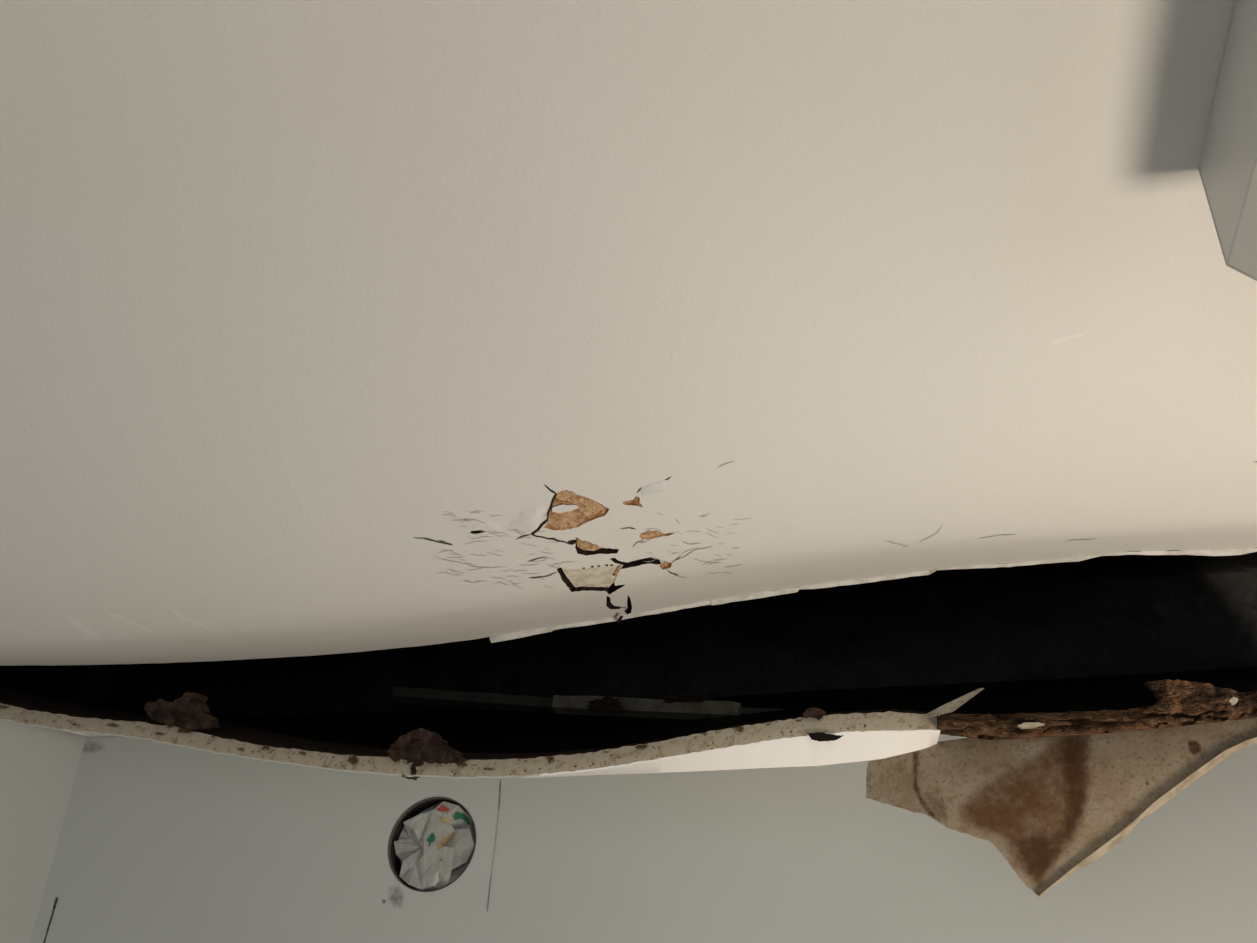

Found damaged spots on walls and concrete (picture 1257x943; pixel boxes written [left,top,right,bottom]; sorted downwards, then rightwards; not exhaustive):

peeling [545,490,609,551]
peeling [560,564,622,589]
leakage [967,738,1088,873]
peeling [866,679,1257,898]